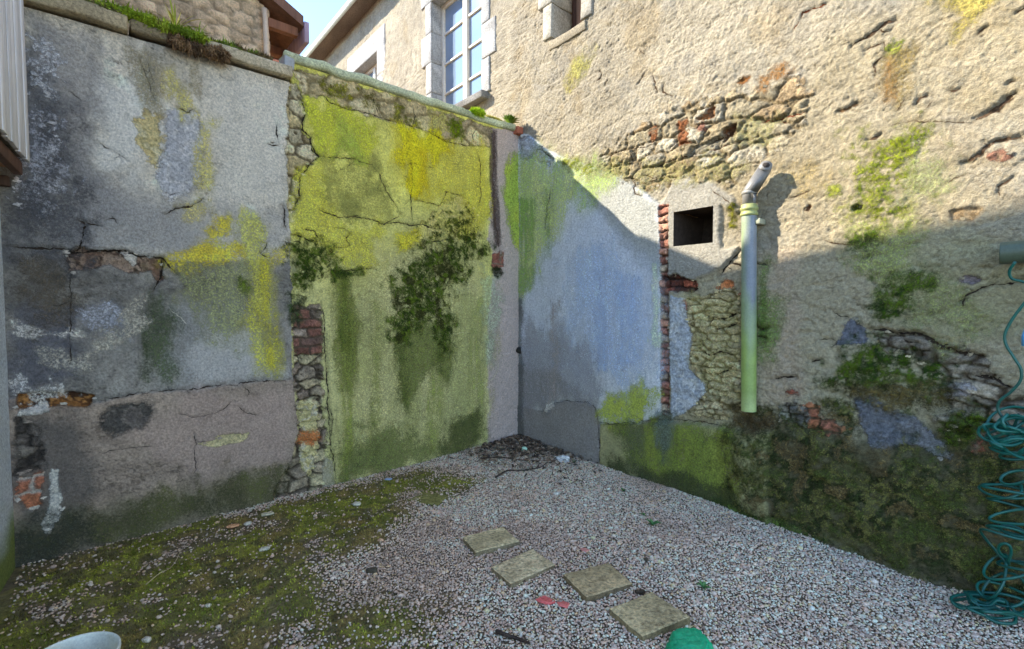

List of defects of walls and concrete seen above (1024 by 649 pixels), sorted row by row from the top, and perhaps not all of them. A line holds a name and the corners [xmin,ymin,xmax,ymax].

crack [852,20,896,76]
crack [259,93,500,277]
damp [488,130,501,249]
flaking render [599,69,815,192]
crack [870,81,1022,183]
crack [8,216,190,362]
flaking render [658,204,743,420]
crack [958,279,1024,307]
flaking render [12,388,97,534]
flaking render [273,304,330,499]
flaking render [778,389,852,437]
flaking render [871,329,1024,461]